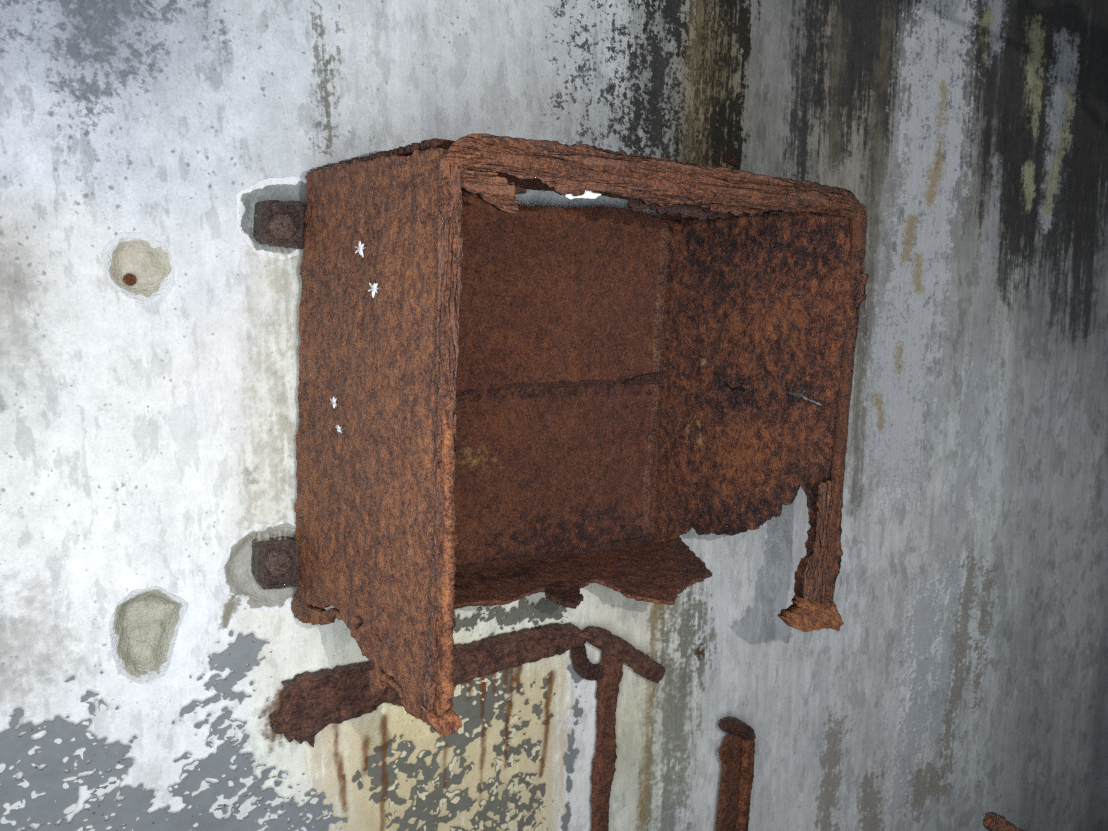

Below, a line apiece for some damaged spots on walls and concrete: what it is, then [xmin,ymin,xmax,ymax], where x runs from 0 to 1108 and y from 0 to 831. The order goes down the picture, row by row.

damp [548,0,760,170]
spalling [101,232,175,305]
spalling [236,176,307,259]
damp [783,0,1108,522]
peeling [0,522,348,831]
rust [335,723,346,809]
rust [380,715,388,831]
peeling [342,665,583,831]
rust [469,665,522,771]
peeling [453,597,568,641]
rust [540,672,554,777]
rust [715,716,756,831]